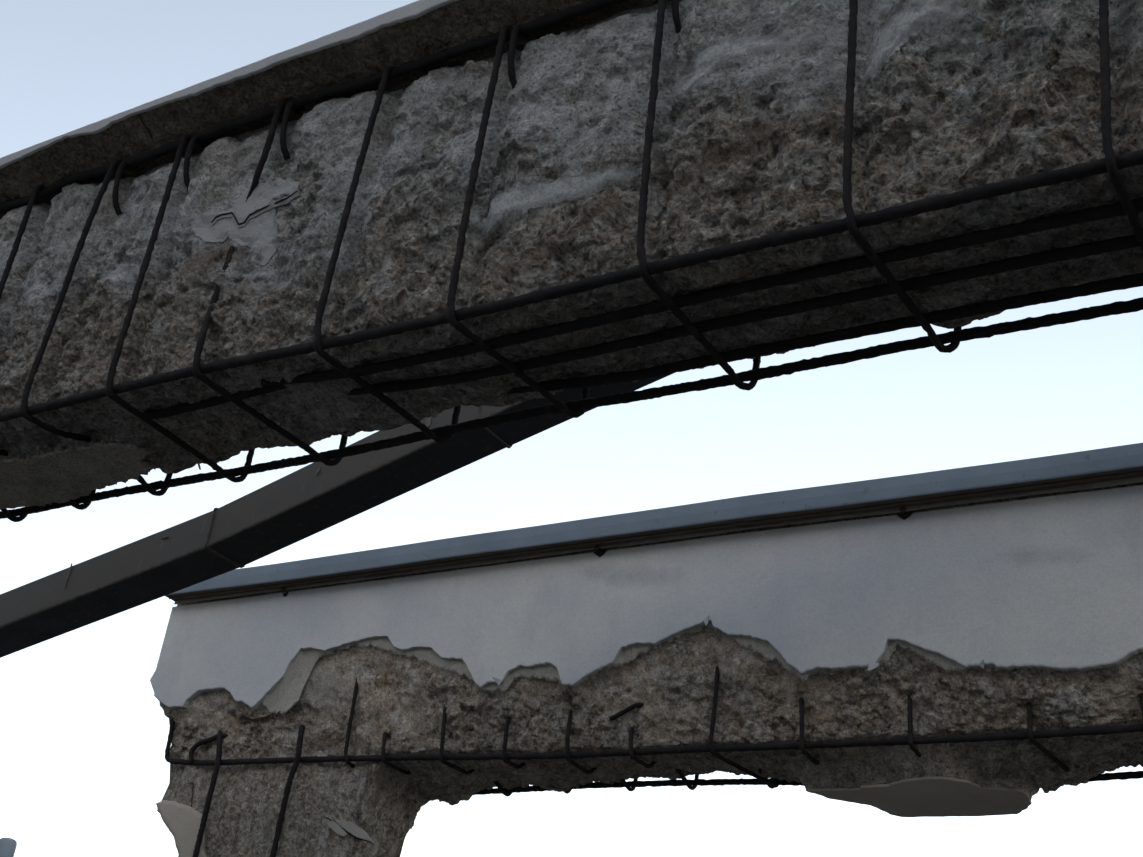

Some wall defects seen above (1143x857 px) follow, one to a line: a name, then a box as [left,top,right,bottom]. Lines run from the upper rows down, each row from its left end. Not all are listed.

spalling [0,0,1143,519]
spalling [177,482,1143,606]
spalling [156,615,1143,857]